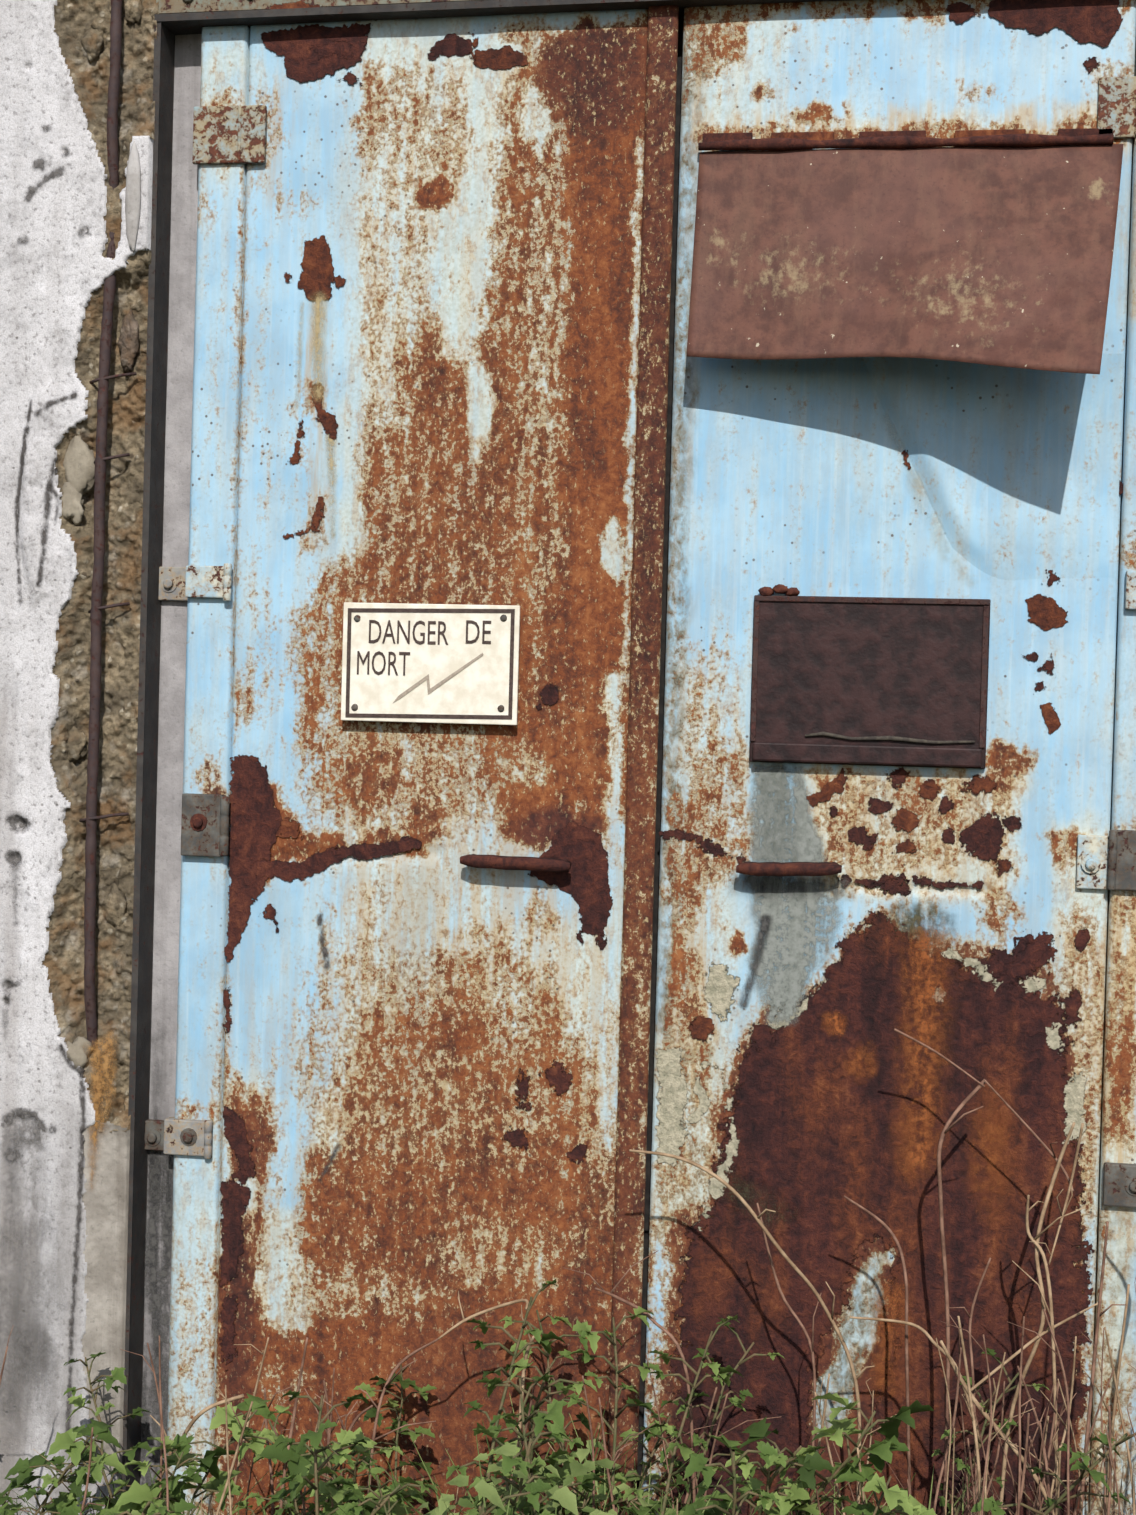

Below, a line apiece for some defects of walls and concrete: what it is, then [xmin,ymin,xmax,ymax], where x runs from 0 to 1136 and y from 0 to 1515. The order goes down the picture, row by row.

corrosion [270,1,327,16]
spalling [25,149,69,201]
corrosion [283,235,347,539]
corrosion [758,584,800,596]
spalling [42,0,159,1475]
corrosion [535,683,559,710]
corrosion [502,1059,573,1150]
corrosion [566,1143,588,1164]
corrosion [659,767,1095,1515]
corrosion [219,1106,256,1371]